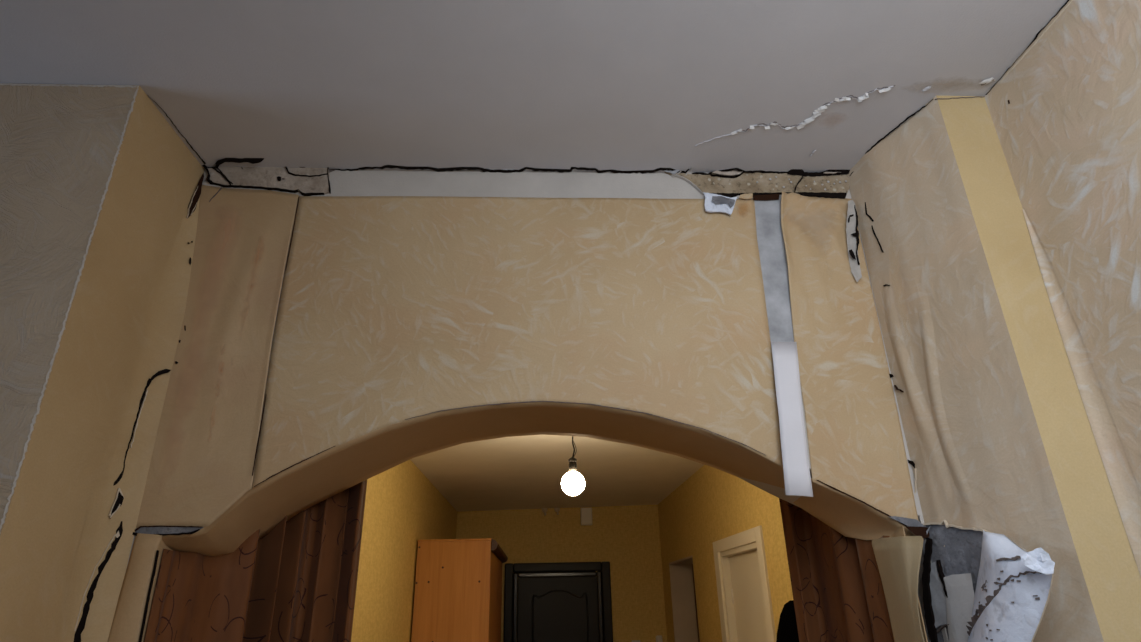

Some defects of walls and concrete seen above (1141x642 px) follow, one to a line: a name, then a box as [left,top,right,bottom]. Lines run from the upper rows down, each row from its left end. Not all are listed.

crack [331,0,1073,177]
peeling [695,85,895,146]
flaking render [664,168,850,348]
crack [114,361,178,485]
crack [74,521,200,642]
flaking render [890,516,983,642]